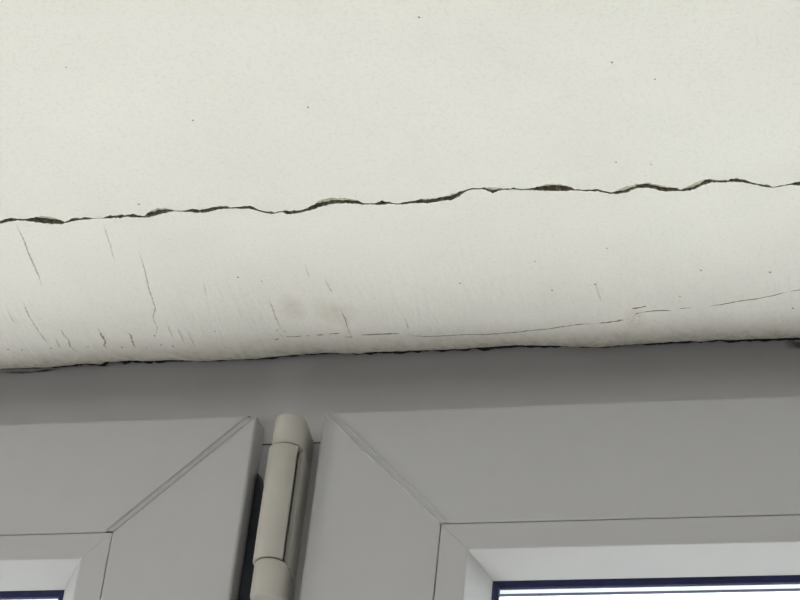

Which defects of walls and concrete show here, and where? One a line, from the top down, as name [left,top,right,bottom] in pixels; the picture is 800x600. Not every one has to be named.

crack [0,178,800,224]
crack [603,306,684,323]
crack [14,324,800,369]